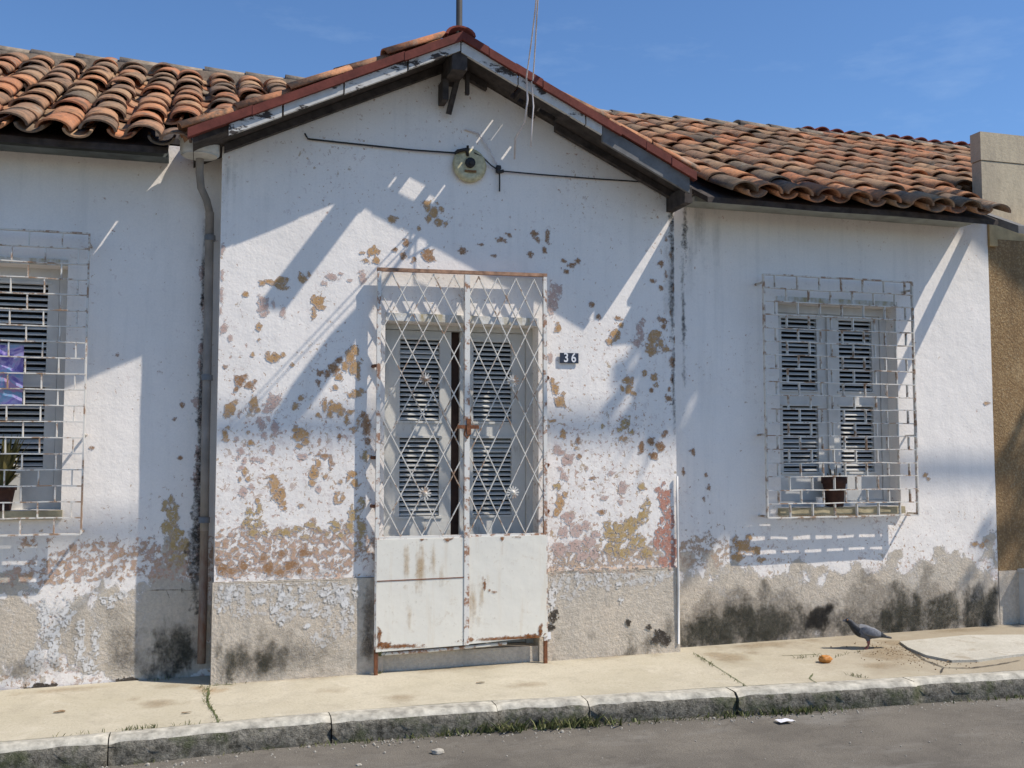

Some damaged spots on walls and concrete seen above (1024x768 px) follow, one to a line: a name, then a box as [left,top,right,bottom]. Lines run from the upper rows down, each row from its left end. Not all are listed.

peeling [243,198,448,367]
peeling [547,258,581,332]
peeling [605,309,676,402]
peeling [0,343,375,689]
peeling [547,377,1000,647]
leakage [156,627,193,677]
leakage [227,649,273,674]
rust [377,627,422,649]
rust [458,623,546,642]
leakage [681,605,791,646]
leakage [806,604,833,628]
leakage [880,586,999,633]